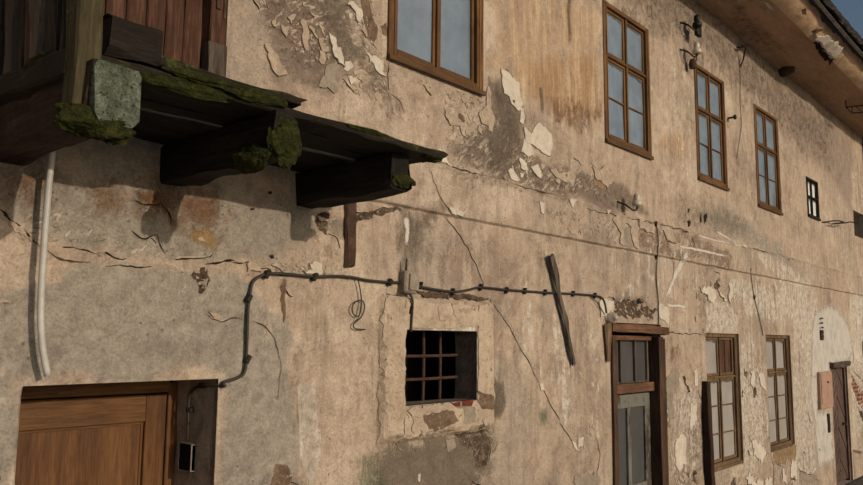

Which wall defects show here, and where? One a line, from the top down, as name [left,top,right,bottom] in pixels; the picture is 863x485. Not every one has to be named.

peeling [264,43,288,76]
peeling [271,0,391,100]
water stain [539,87,596,126]
water stain [621,0,832,157]
peeling [810,29,844,66]
crack [0,209,151,268]
crack [175,255,244,264]
crack [430,149,572,441]
spalling [407,391,495,434]
peeling [666,367,703,485]
peeling [742,364,768,463]
flaking render [850,345,863,432]